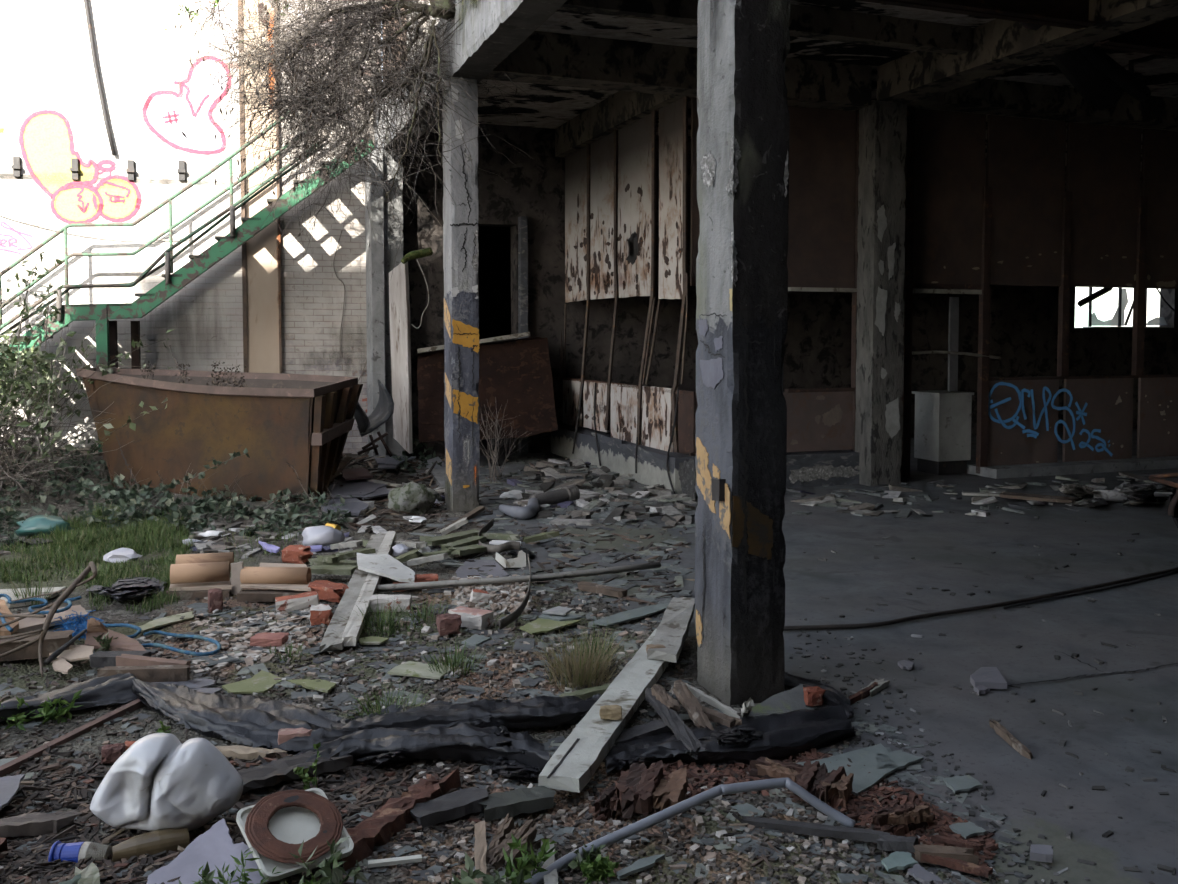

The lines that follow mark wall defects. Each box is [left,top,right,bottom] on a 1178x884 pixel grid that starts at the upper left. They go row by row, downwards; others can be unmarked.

crack [449,148,478,272]
peeling [875,204,901,336]
crack [452,303,478,458]
peeling [698,319,724,389]
peeling [885,398,900,439]